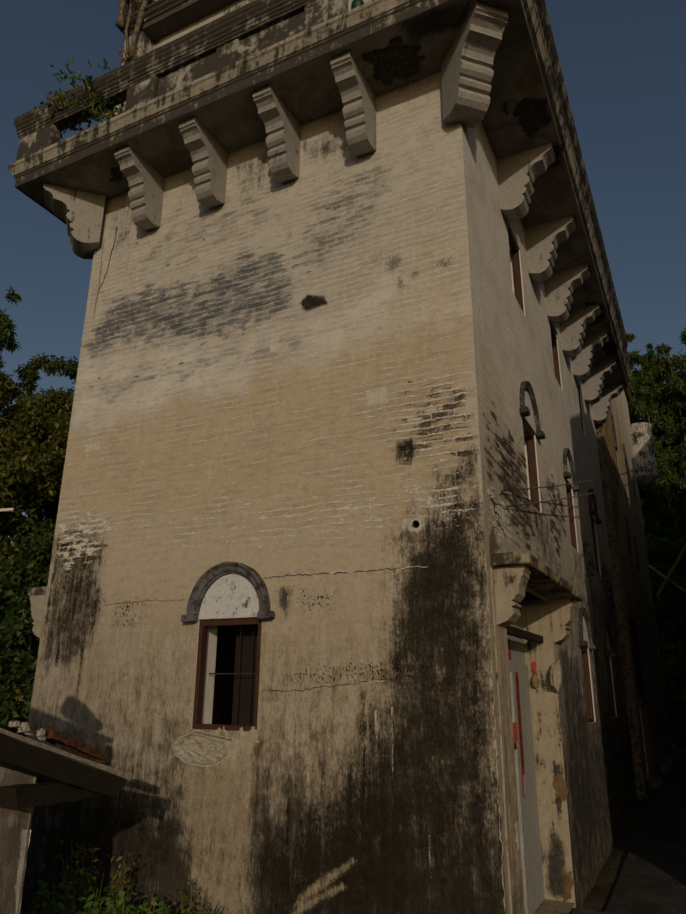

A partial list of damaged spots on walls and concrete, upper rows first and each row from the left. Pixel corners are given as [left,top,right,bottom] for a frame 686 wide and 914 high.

crack [99,228,117,287]
water stain [45,530,103,664]
peeling [52,154,568,913]
crack [263,564,472,579]
water stain [260,454,522,914]
water stain [559,580,632,871]
water stain [547,833,564,897]